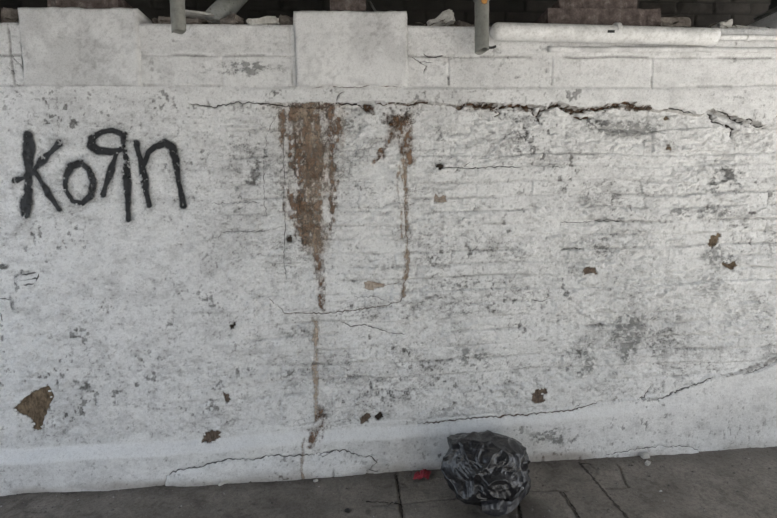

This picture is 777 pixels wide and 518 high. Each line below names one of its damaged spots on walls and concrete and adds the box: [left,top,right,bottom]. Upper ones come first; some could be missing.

corrosion [278,102,343,311]
corrosion [363,104,418,238]
spalling [223,99,777,430]
crack [456,102,763,137]
peeling [201,430,221,443]
crack [170,449,377,474]
corrosion [301,317,324,480]
crack [366,475,403,518]